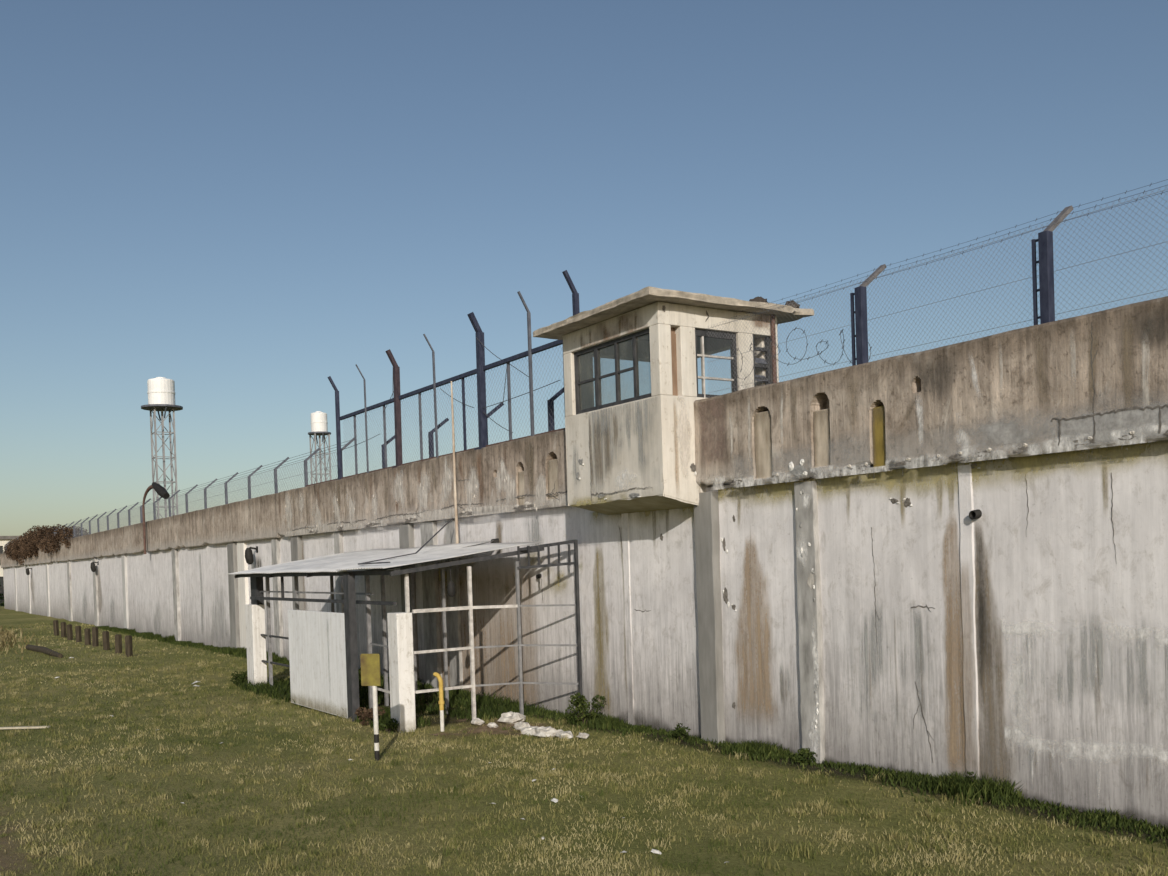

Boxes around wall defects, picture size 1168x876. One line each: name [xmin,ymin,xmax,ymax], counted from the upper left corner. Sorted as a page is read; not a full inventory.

damp [1124,318,1165,406]
damp [1111,425,1168,445]
damp [959,432,1014,462]
damp [1028,437,1088,455]
damp [811,461,888,479]
damp [906,456,939,469]
damp [709,473,793,490]
damp [944,528,1053,783]
damp [1058,625,1168,700]
crack [913,682,933,761]
damp [1064,742,1168,763]